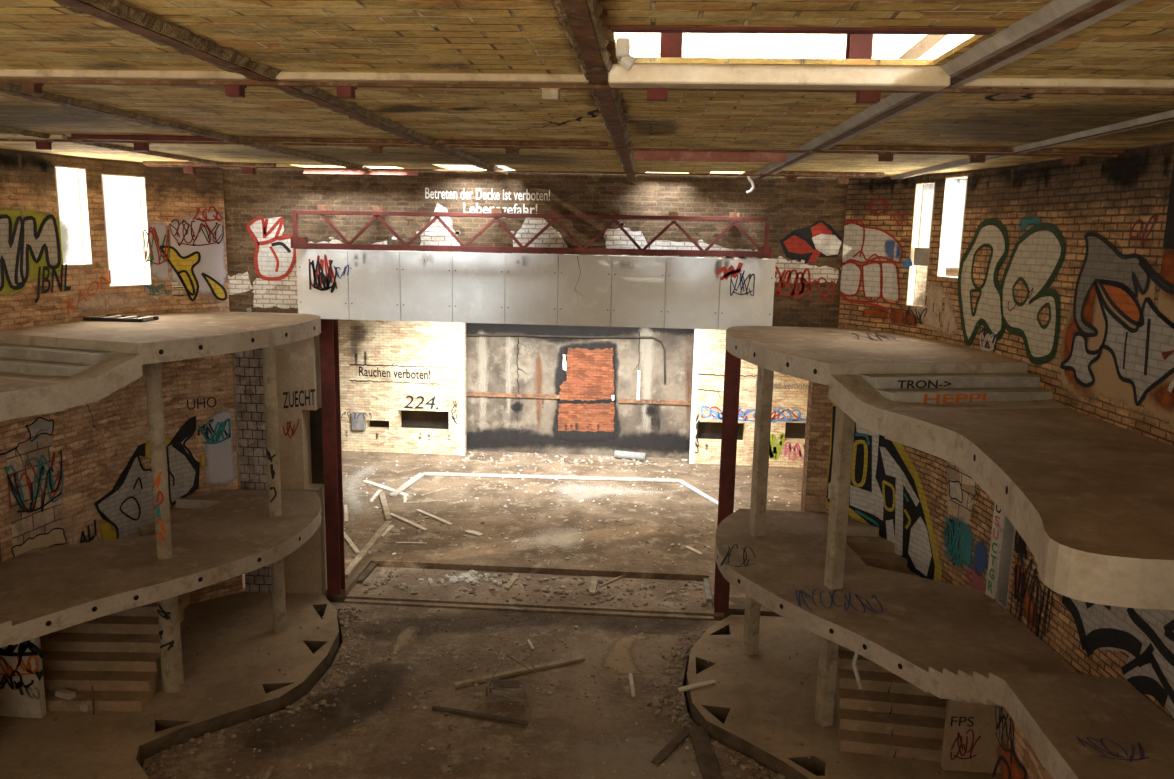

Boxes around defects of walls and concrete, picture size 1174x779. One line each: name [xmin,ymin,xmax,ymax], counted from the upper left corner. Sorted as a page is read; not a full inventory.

water stain [0,153,55,172]
water stain [859,150,1152,195]
water stain [351,327,366,364]
water stain [466,323,695,453]